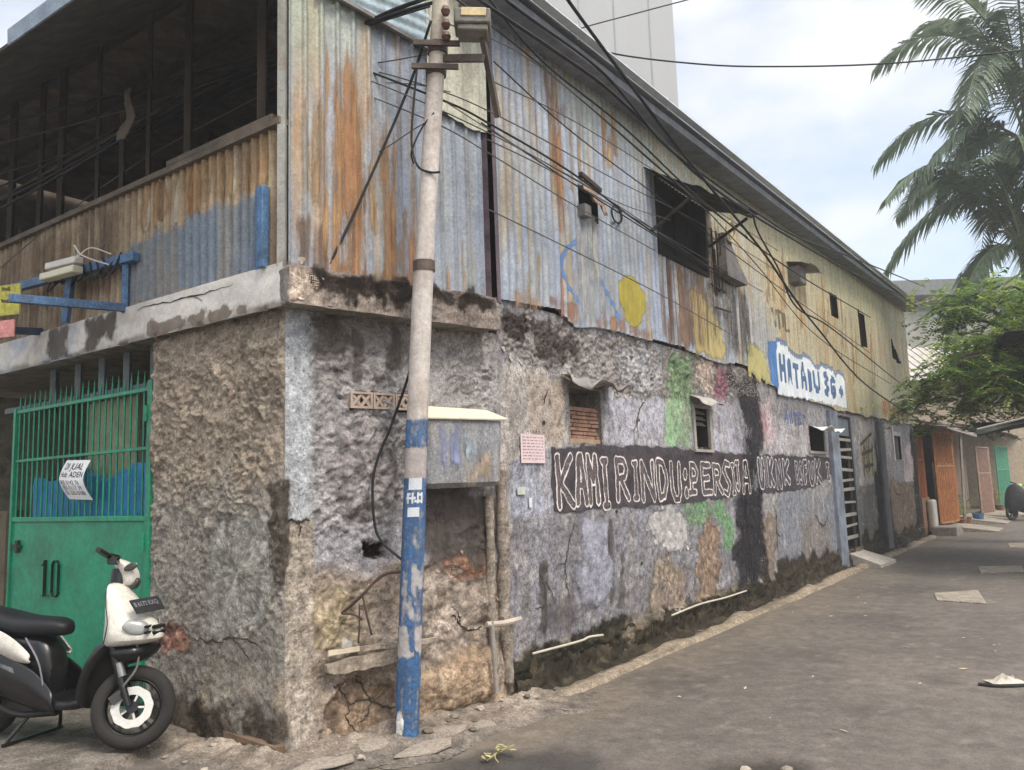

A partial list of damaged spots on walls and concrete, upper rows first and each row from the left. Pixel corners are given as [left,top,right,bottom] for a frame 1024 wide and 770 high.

rust [136,137,276,231]
rust [298,48,416,284]
rust [535,56,581,230]
crack [139,284,233,310]
water stain [308,265,413,311]
flaking render [155,479,294,656]
crack [194,636,263,662]
crack [333,675,395,733]